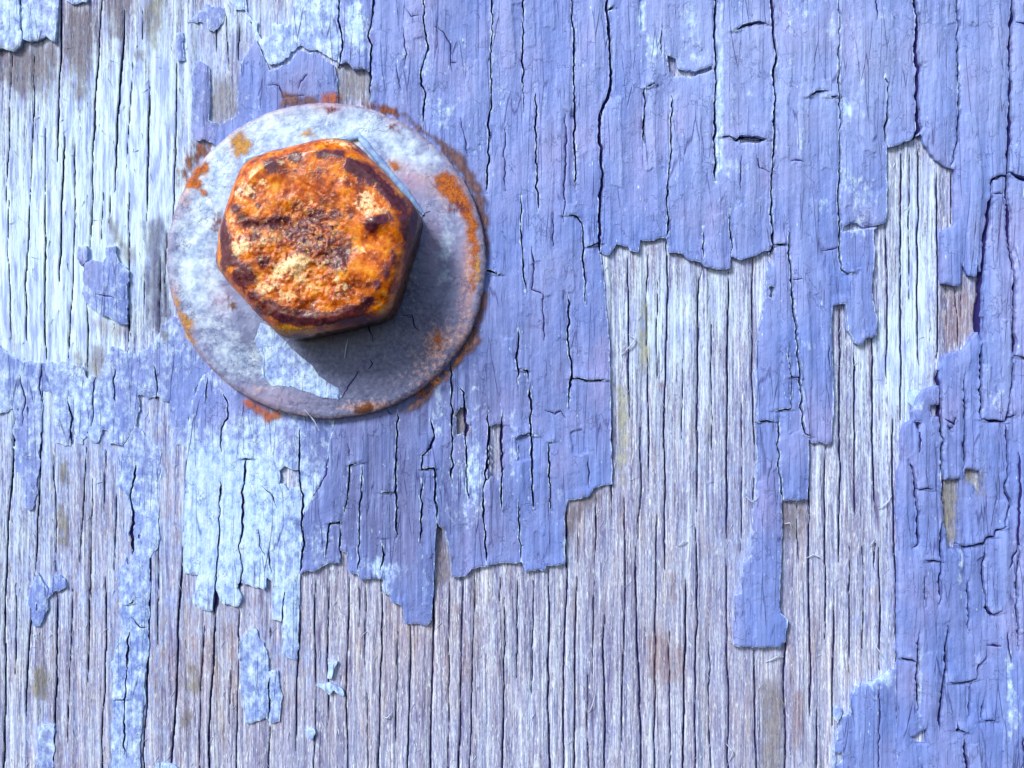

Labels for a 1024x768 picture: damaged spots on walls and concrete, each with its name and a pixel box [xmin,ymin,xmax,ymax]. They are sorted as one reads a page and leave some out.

peeling [0,0,89,53]
peeling [176,32,186,62]
rust [232,133,251,156]
peeling [77,246,130,324]
peeling [187,0,916,648]
crack [270,0,1024,768]
peeling [833,0,1024,768]
peeling [0,316,336,768]
peeling [317,661,344,696]